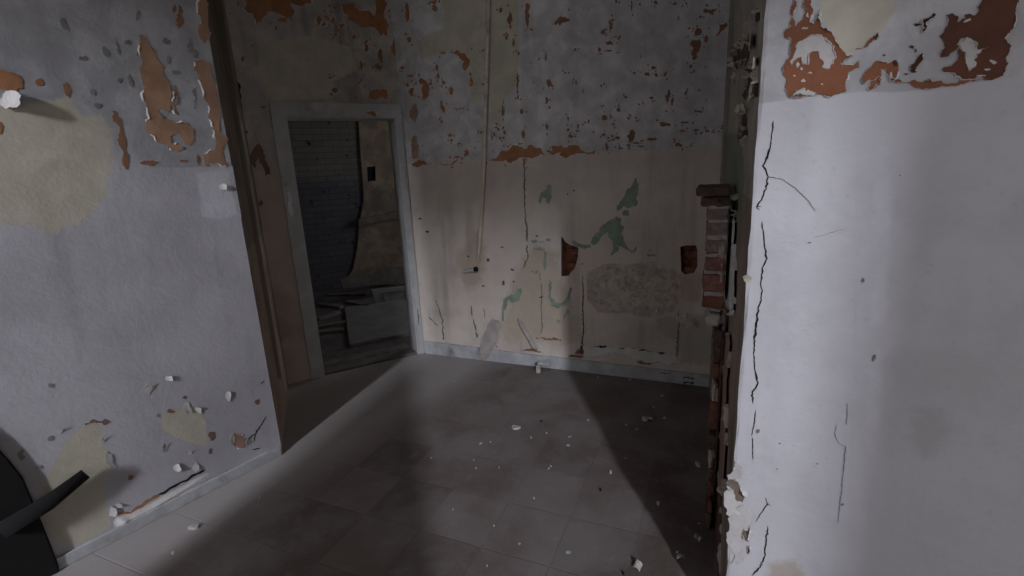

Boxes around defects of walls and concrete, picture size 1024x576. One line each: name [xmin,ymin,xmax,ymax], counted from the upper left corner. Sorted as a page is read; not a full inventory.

flaking render [0,70,158,242]
peeling [102,0,229,168]
peeling [244,0,729,168]
peeling [783,0,1021,98]
crack [523,158,543,334]
peeling [531,178,656,324]
crack [751,121,815,455]
flaking render [34,419,123,548]
crack [117,470,205,515]
peeling [681,182,752,576]
crack [752,500,771,576]
crack [834,404,848,521]